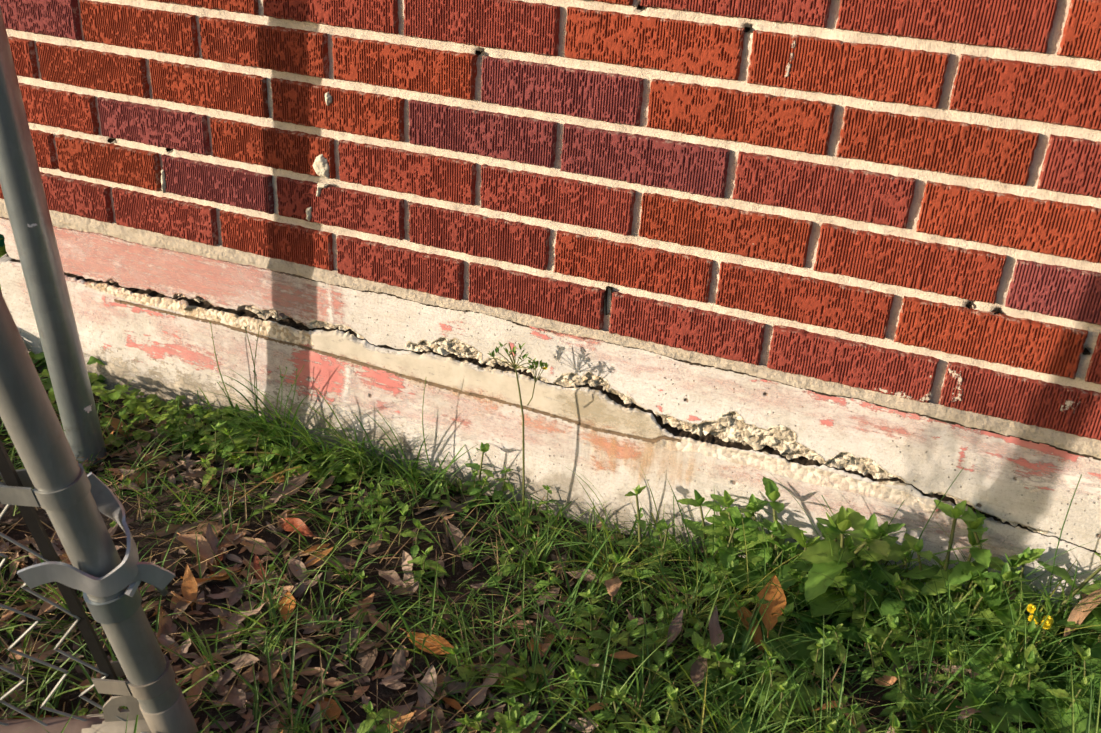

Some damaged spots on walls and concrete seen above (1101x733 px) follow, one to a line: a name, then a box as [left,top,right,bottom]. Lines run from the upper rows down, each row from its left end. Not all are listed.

crack [53,226,1101,555]
spalling [404,321,909,486]
peeling [804,390,1083,491]
spalling [915,491,1048,534]